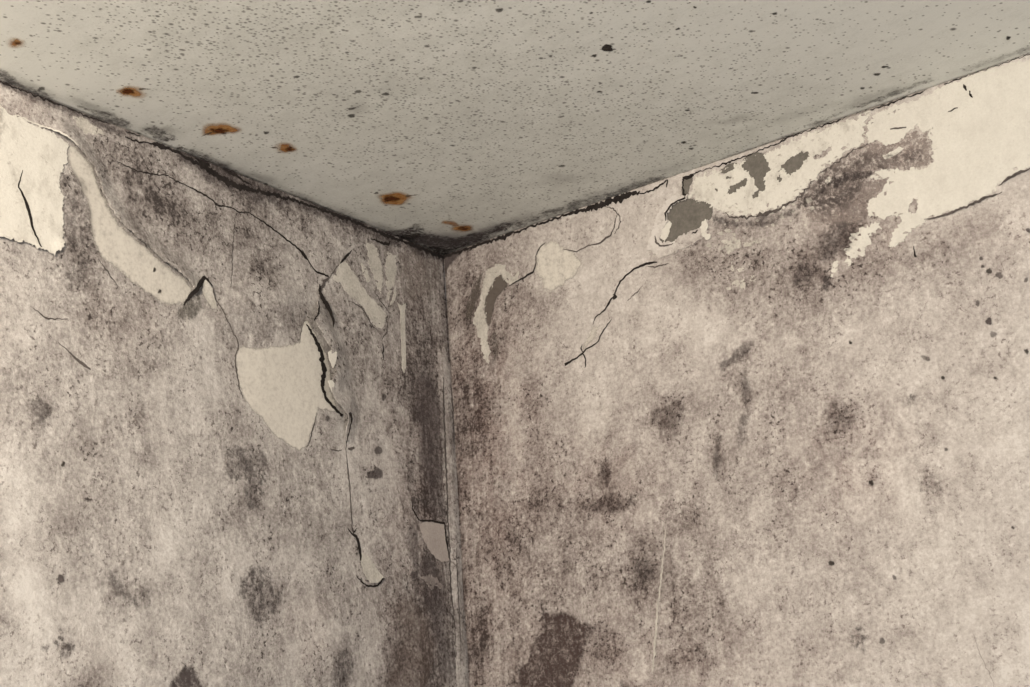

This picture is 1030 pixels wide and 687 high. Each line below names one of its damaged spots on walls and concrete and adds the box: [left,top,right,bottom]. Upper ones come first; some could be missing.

corrosion [119,87,144,97]
corrosion [203,124,239,136]
peeling [0,98,218,319]
corrosion [381,193,412,205]
corrosion [442,221,471,231]
peeling [646,59,1030,290]
spalling [232,242,397,450]
crack [0,54,1030,561]
spalling [466,214,618,364]
spalling [411,499,449,562]
damp [518,607,593,687]